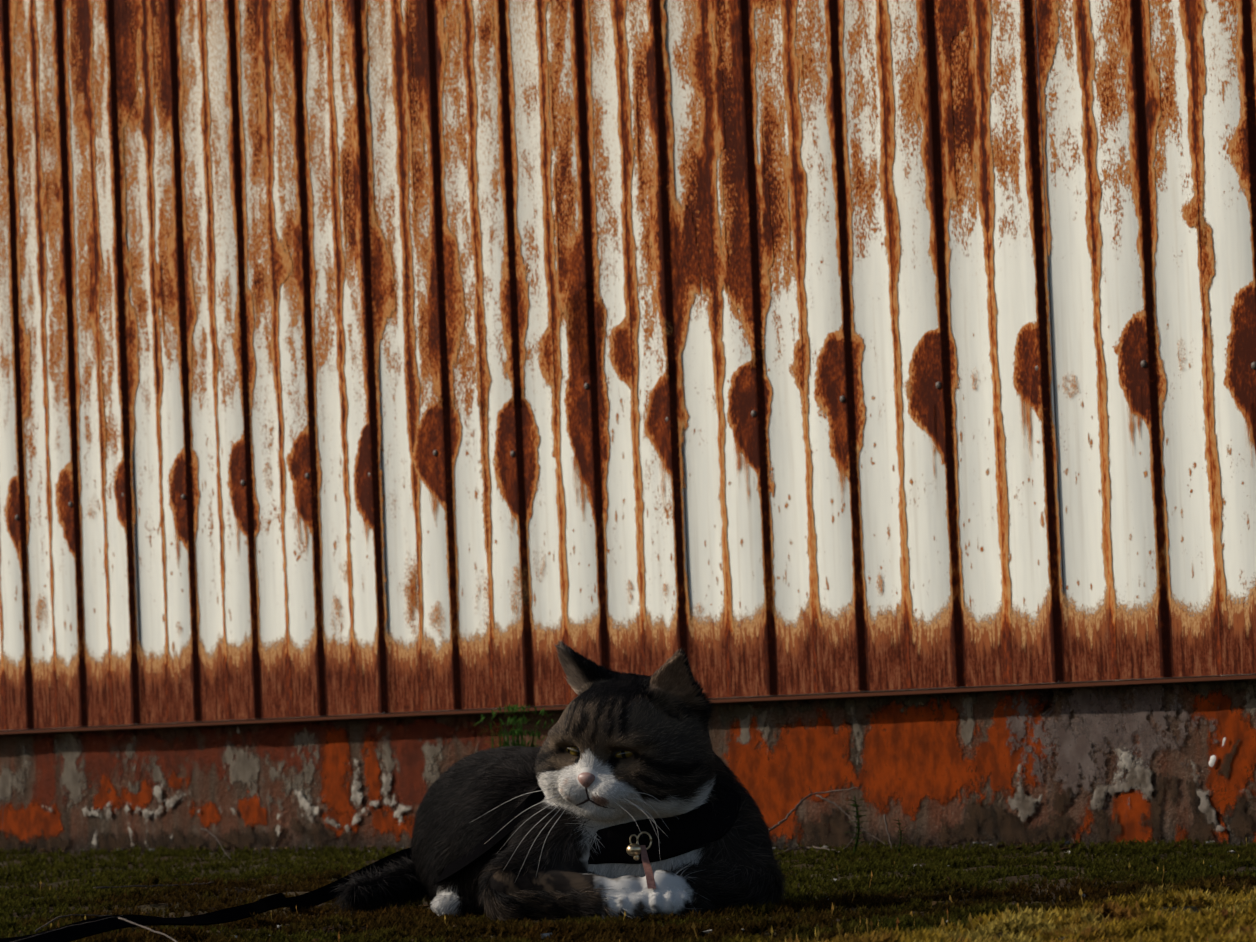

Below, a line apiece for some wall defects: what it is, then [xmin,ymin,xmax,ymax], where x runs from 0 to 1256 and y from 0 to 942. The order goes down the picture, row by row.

corrosion [723,691,1055,843]
peeling [1008,764,1042,822]
peeling [1085,760,1153,811]
peeling [1191,737,1231,832]
corrosion [1189,687,1256,844]